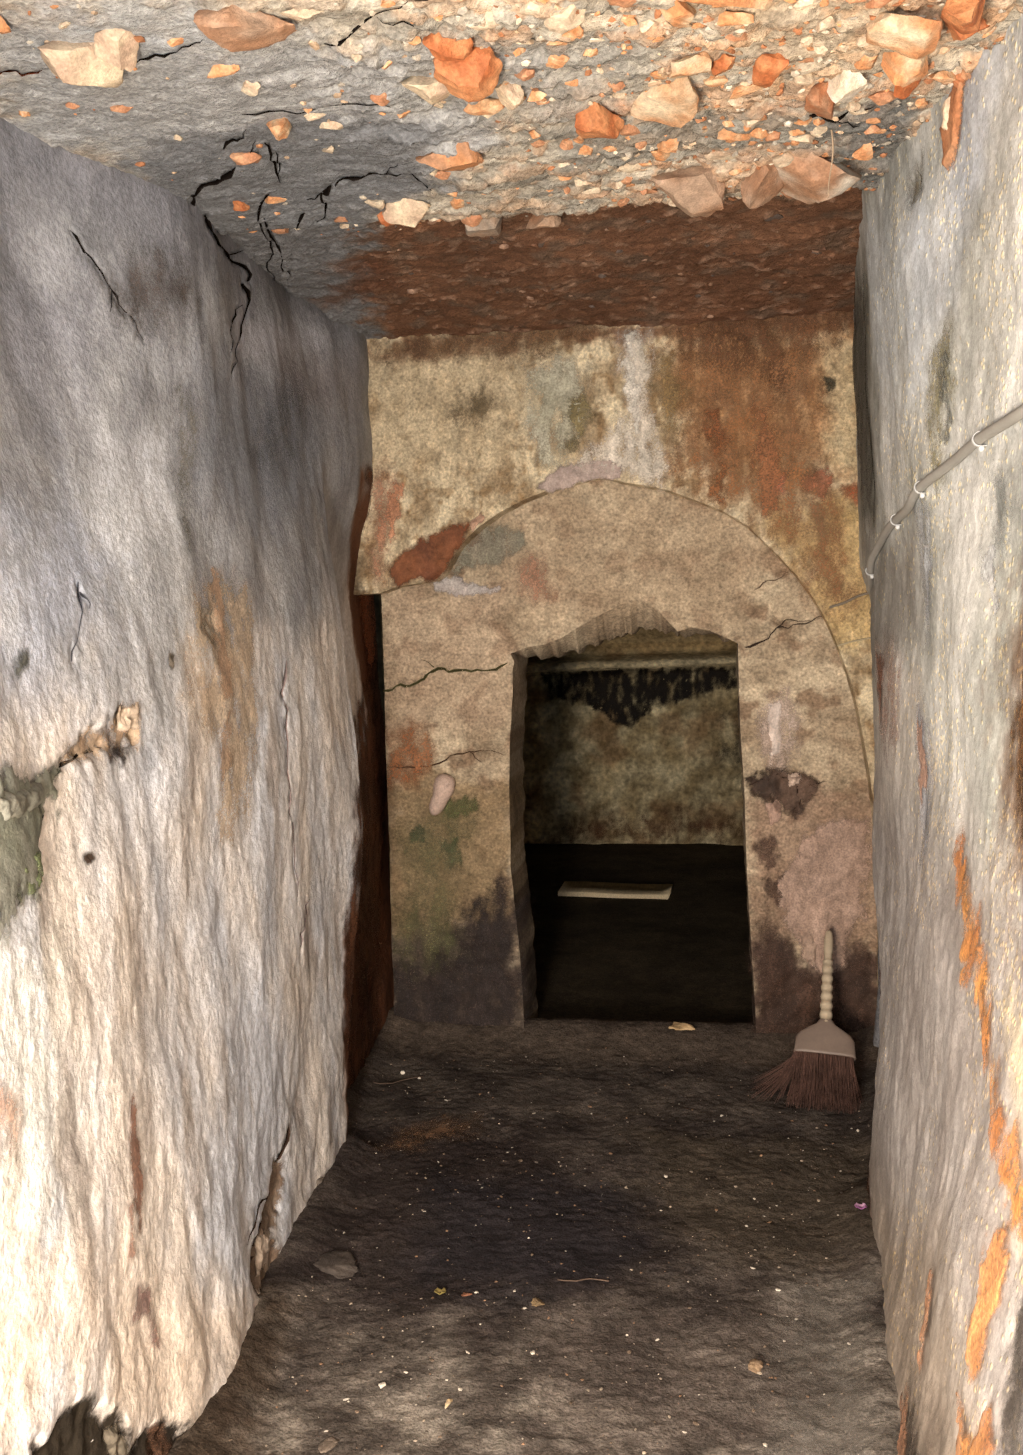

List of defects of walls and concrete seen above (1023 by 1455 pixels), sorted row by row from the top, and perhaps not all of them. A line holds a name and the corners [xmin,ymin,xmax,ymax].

crack [70,230,144,340]
crack [191,103,431,374]
water stain [384,286,875,517]
spalling [390,513,501,597]
crack [383,660,507,692]
crack [745,616,822,648]
peeling [0,702,140,945]
spalling [745,687,819,825]
peeling [778,817,872,973]
rust [952,834,1023,1380]
rust [897,1387,908,1455]
rust [956,1392,993,1455]